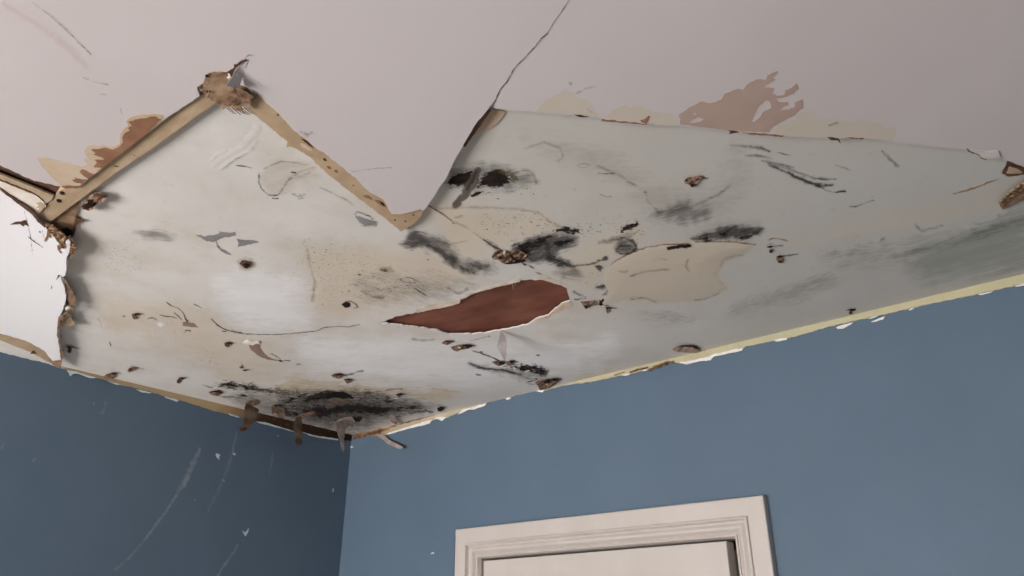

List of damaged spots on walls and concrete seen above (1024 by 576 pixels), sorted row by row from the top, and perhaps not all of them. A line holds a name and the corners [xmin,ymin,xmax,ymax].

peeling [37,114,163,188]
crack [489,2,568,111]
peeling [536,71,803,132]
leakage [289,123,1024,323]
crack [151,302,355,335]
leakage [88,242,468,423]
peeling [194,257,629,414]